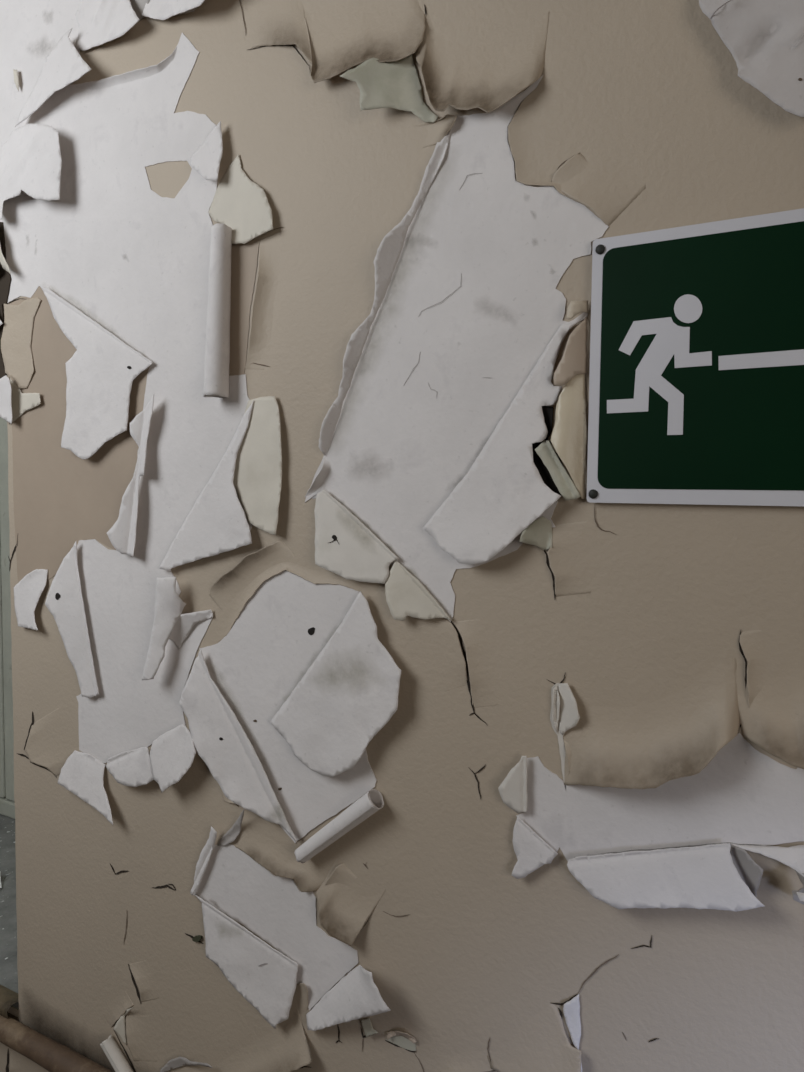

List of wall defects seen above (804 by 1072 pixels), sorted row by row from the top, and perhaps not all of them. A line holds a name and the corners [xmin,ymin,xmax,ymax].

peeling [699,0,804,117]
peeling [0,0,646,1052]
crack [419,619,500,726]
peeling [498,658,804,912]